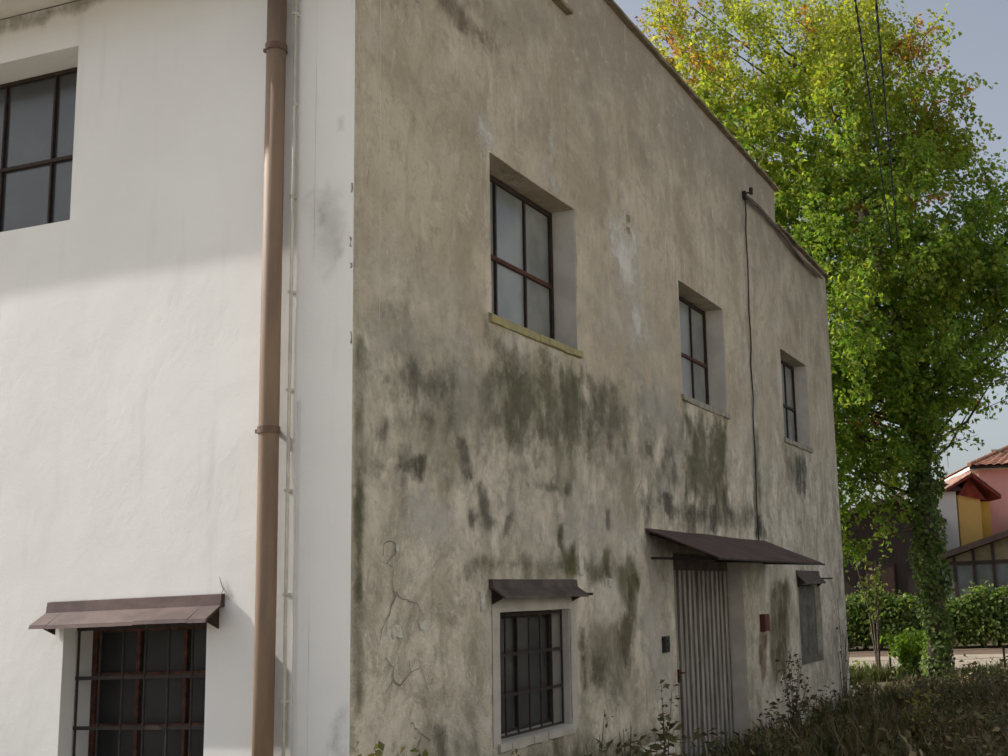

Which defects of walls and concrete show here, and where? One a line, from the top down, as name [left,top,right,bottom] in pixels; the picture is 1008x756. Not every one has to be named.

damp [491,353,595,441]
damp [471,488,492,529]
damp [558,526,575,571]
damp [665,415,746,533]
crack [379,540,432,755]
damp [581,578,639,686]